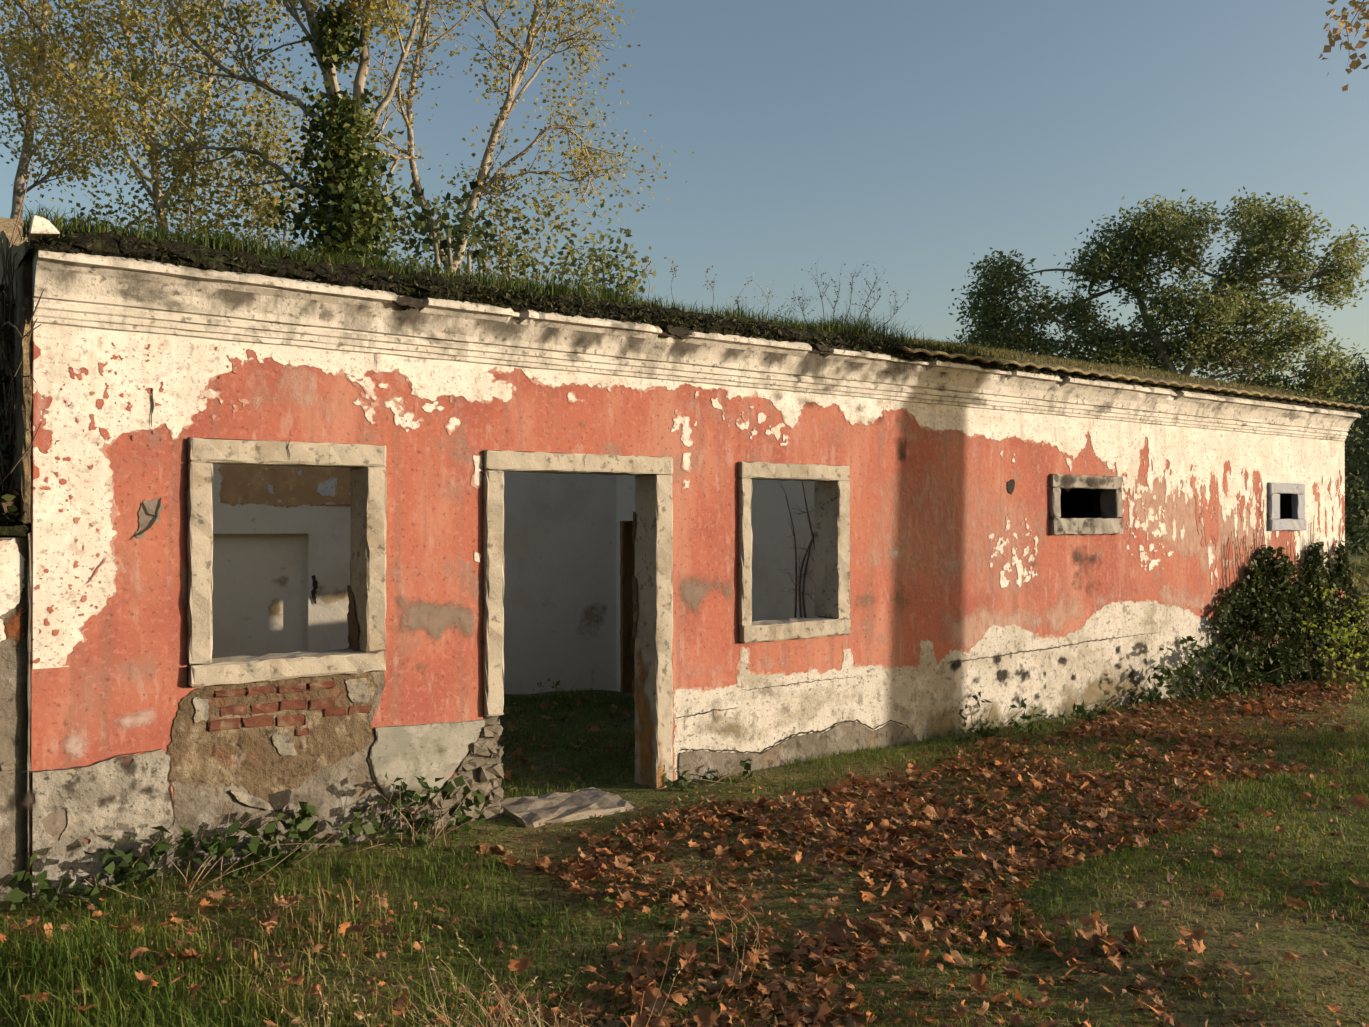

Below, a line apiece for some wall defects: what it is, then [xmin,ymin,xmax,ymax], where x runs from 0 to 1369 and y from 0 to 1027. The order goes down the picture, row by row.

peeling [0,323,1345,669]
flaking render [32,671,504,898]
peeling [672,599,1236,784]